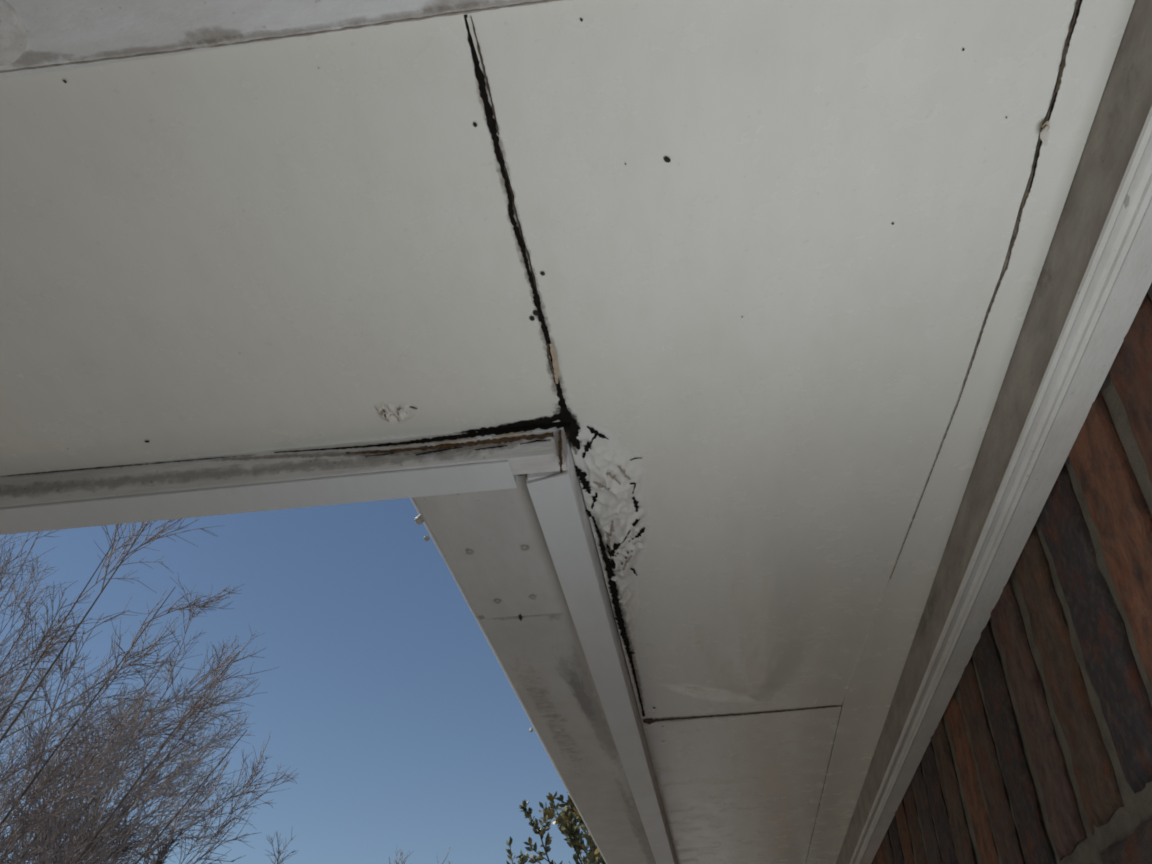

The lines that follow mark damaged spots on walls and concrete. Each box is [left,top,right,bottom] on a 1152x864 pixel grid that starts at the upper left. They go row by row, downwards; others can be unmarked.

crack [0,0,567,407]
peeling [416,439,551,456]
peeling [571,420,651,701]
crack [890,0,1083,579]